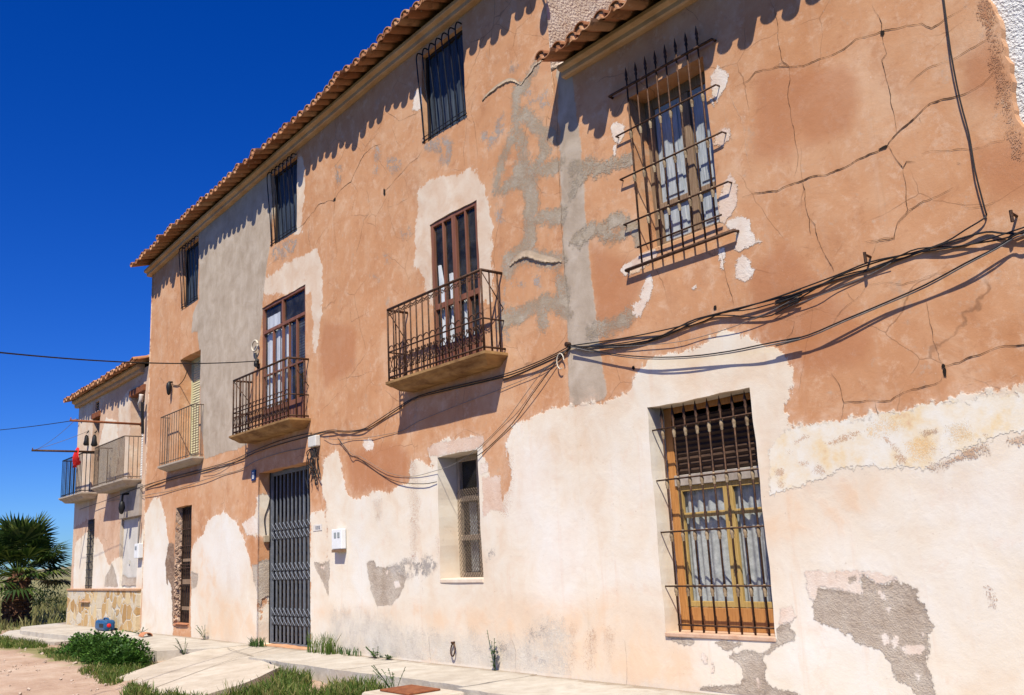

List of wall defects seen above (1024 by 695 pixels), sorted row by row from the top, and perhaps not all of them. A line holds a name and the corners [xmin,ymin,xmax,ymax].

peeling [710,65,729,106]
peeling [611,121,625,156]
crack [750,2,1004,268]
peeling [718,172,763,282]
crack [833,307,1024,415]
peeling [767,390,1024,497]
peeling [165,543,175,624]
peeling [314,561,330,595]
peeling [367,560,406,606]
peeling [668,637,695,646]
peeling [700,605,801,695]
peeling [804,568,936,695]